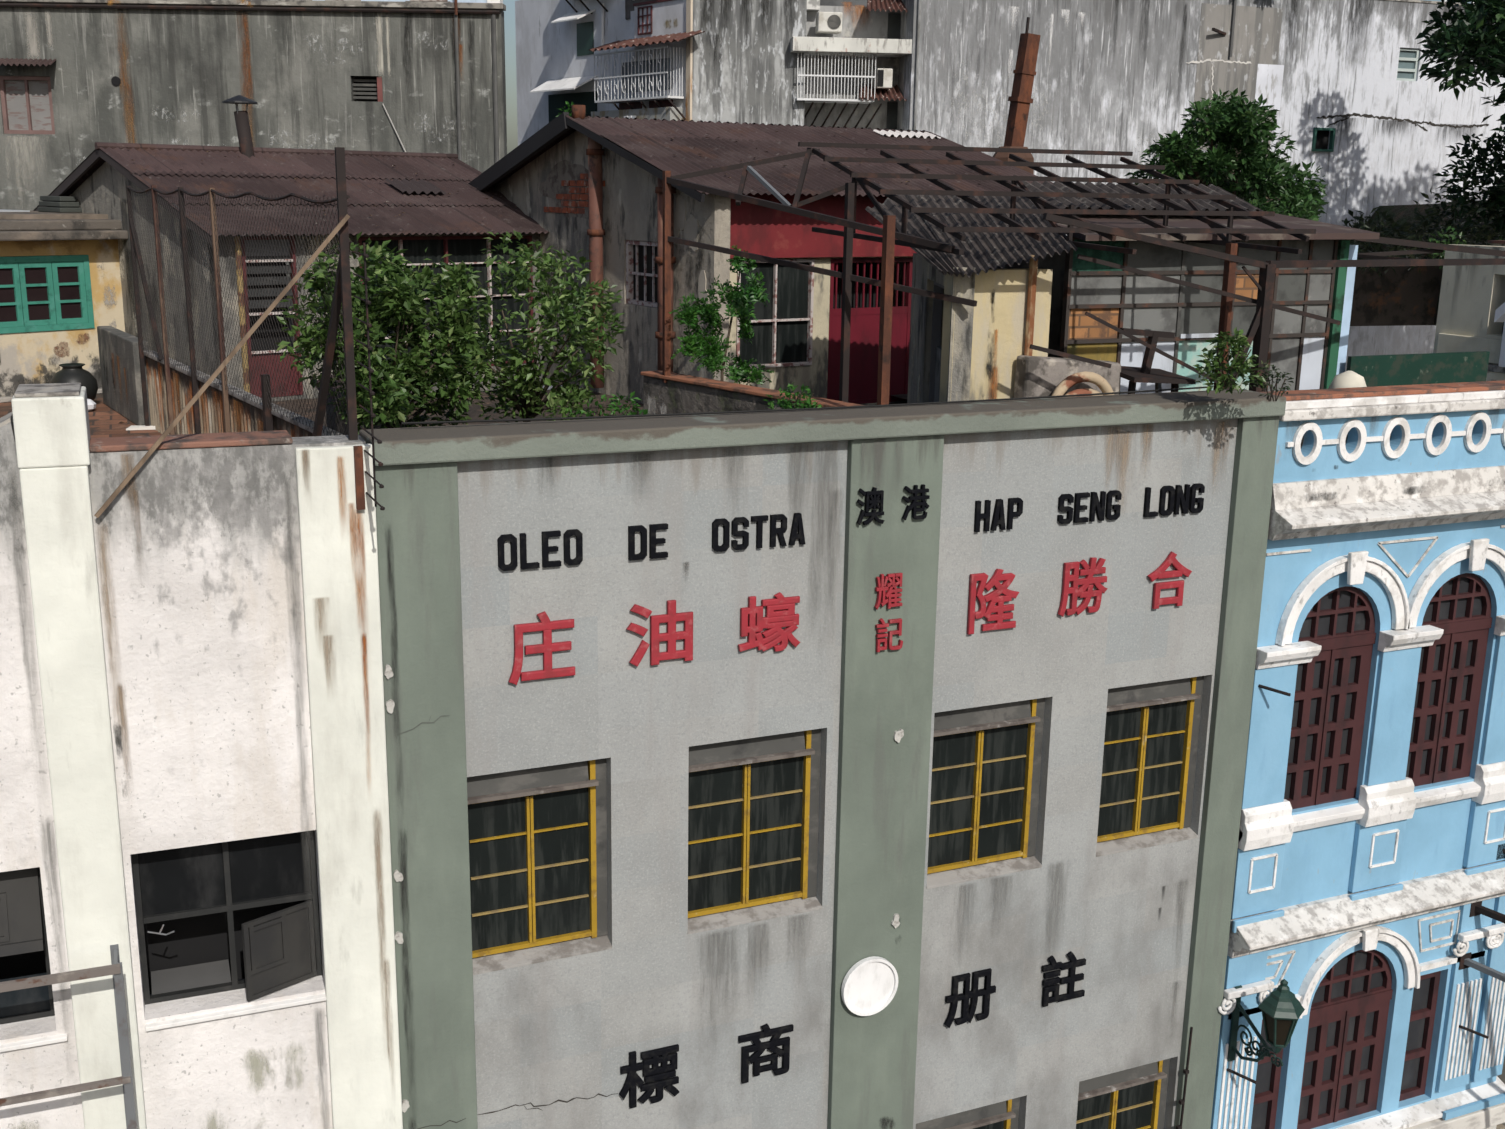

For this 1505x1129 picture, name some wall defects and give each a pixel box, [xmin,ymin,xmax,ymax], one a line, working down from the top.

water stain [27,13,51,56]
water stain [377,15,473,78]
crack [1316,113,1489,131]
spalling [539,160,605,219]
corrosion [338,458,364,611]
crack [418,1093,618,1129]